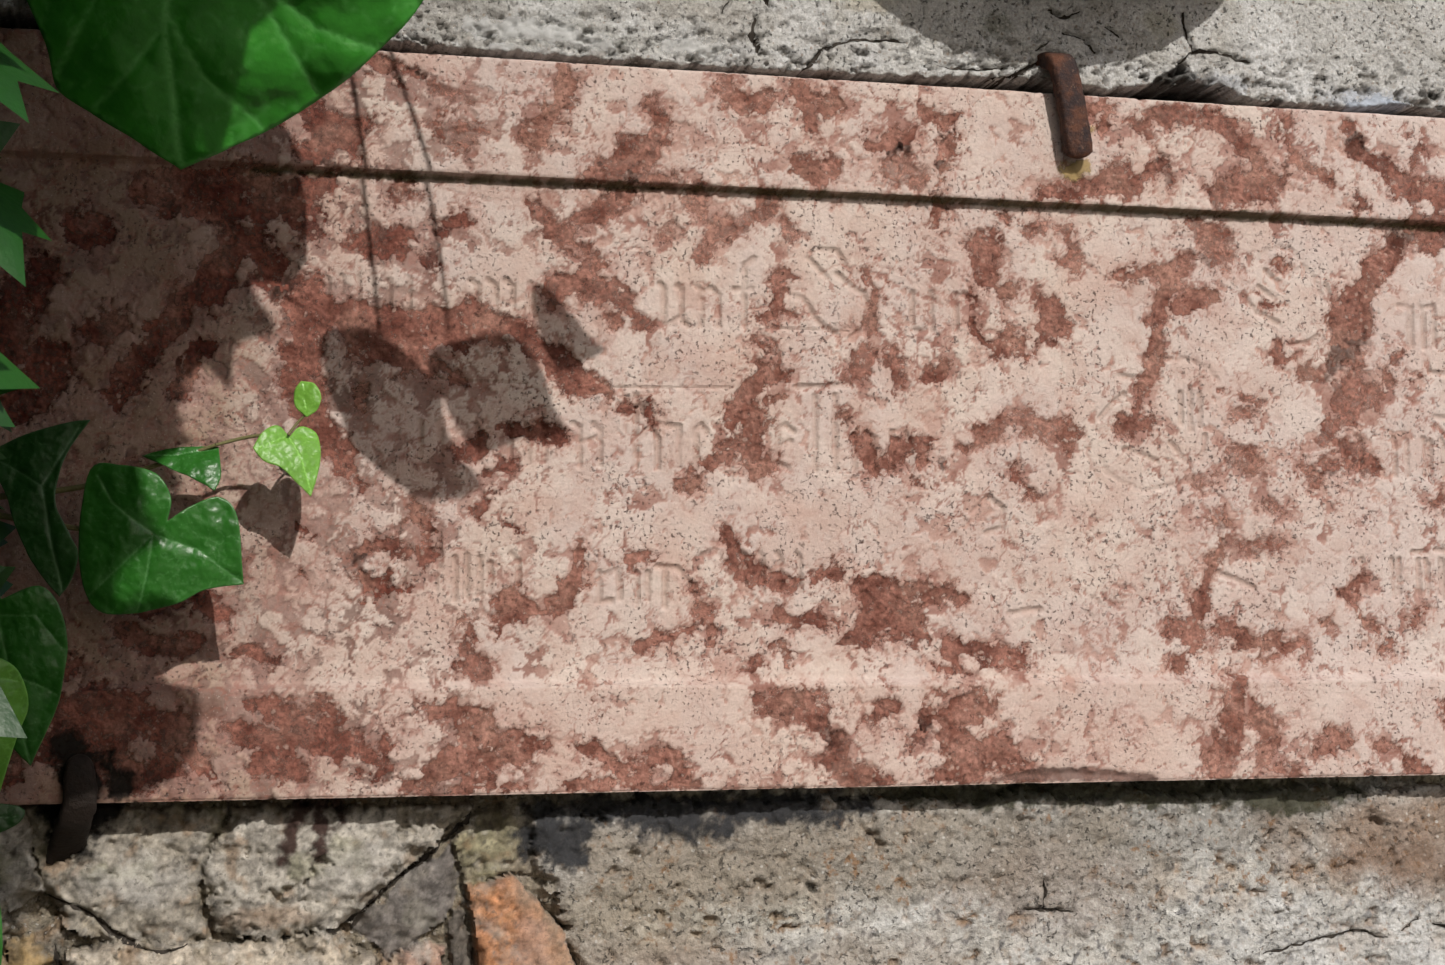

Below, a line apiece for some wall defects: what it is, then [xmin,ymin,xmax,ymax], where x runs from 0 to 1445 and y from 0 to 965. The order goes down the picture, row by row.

crack [722,0,769,54]
crack [799,38,906,74]
crack [945,9,1119,90]
crack [1177,12,1250,65]